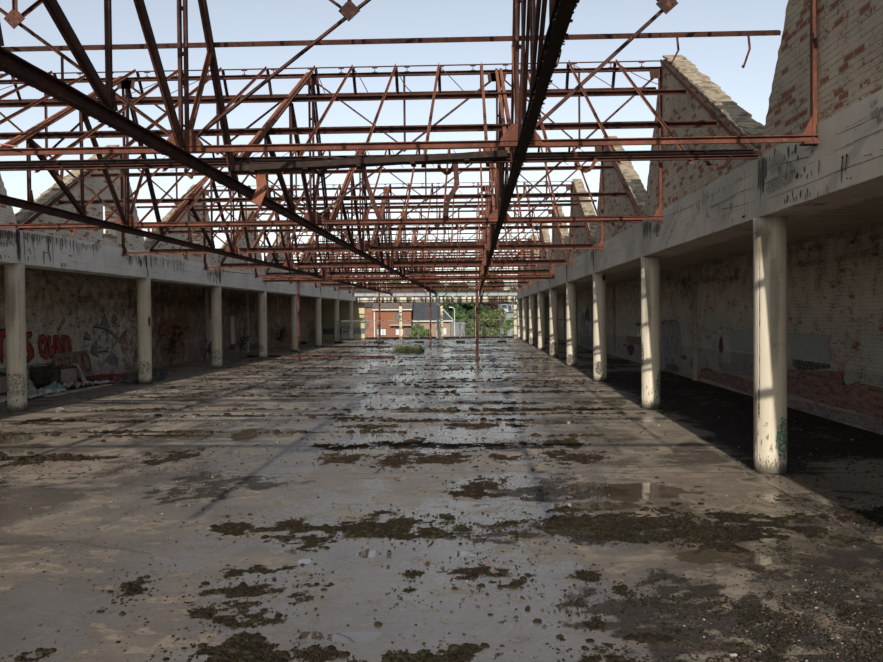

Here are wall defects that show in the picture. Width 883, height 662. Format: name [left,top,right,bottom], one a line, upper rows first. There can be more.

damp [758,145,818,204]
damp [0,229,101,267]